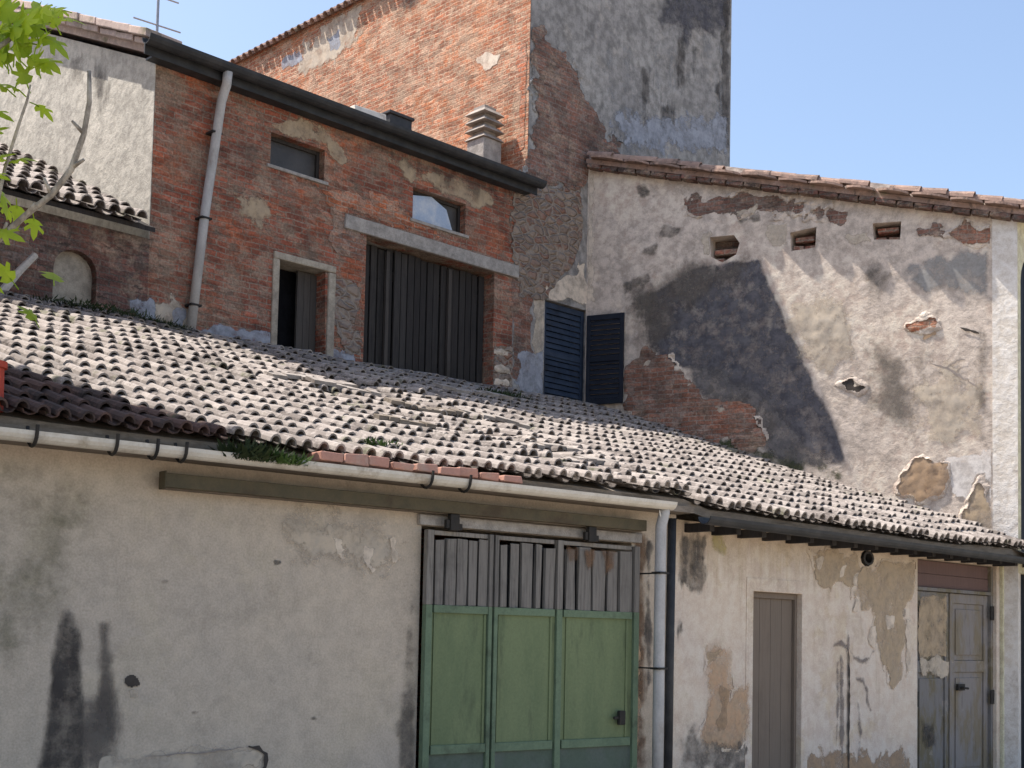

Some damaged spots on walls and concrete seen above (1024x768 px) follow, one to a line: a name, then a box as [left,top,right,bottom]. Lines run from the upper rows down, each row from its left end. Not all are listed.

flaking render [513,24,623,190]
flaking render [682,188,871,246]
flaking render [624,275,649,289]
spalling [903,311,942,340]
spalling [623,346,769,454]
flaking render [834,353,908,419]
spalling [893,454,951,506]
spalling [958,473,991,527]
leakage [681,536,726,590]
peeling [806,546,949,689]
peeling [698,649,749,753]